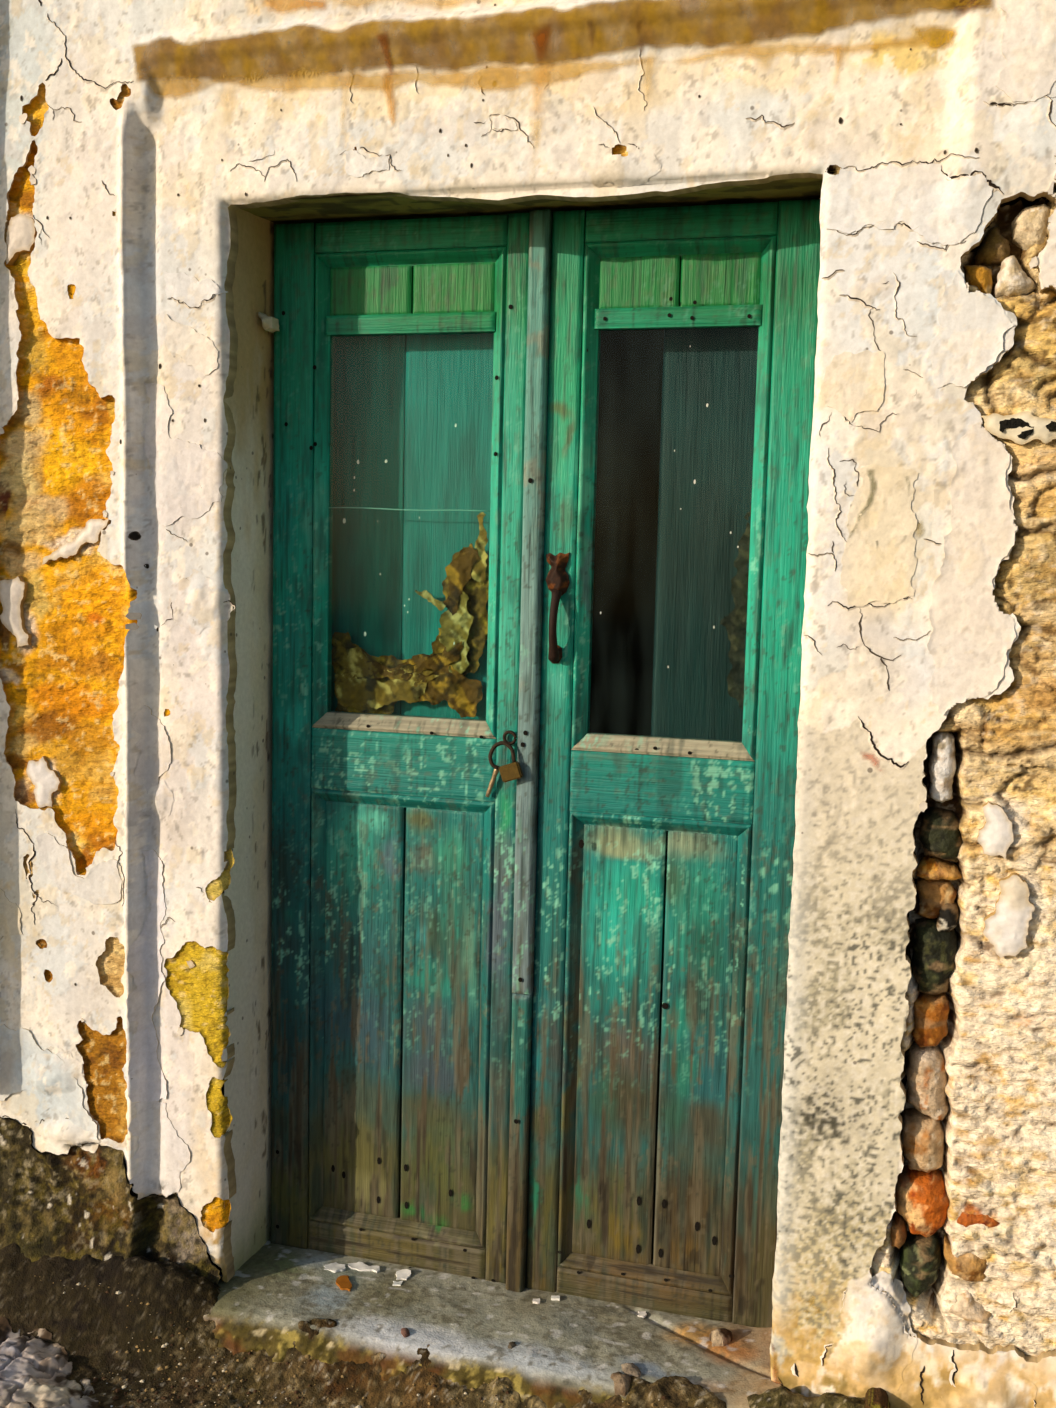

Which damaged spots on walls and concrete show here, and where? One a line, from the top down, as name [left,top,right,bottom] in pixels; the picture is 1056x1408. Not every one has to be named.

crack [38,0,133,123]
leakage [134,0,991,119]
crack [843,153,1004,195]
spalling [0,83,172,949]
peeling [141,271,229,526]
crack [168,294,216,310]
crack [804,221,965,691]
crack [858,717,909,771]
spalling [820,150,1056,1357]
spalling [0,848,235,1289]